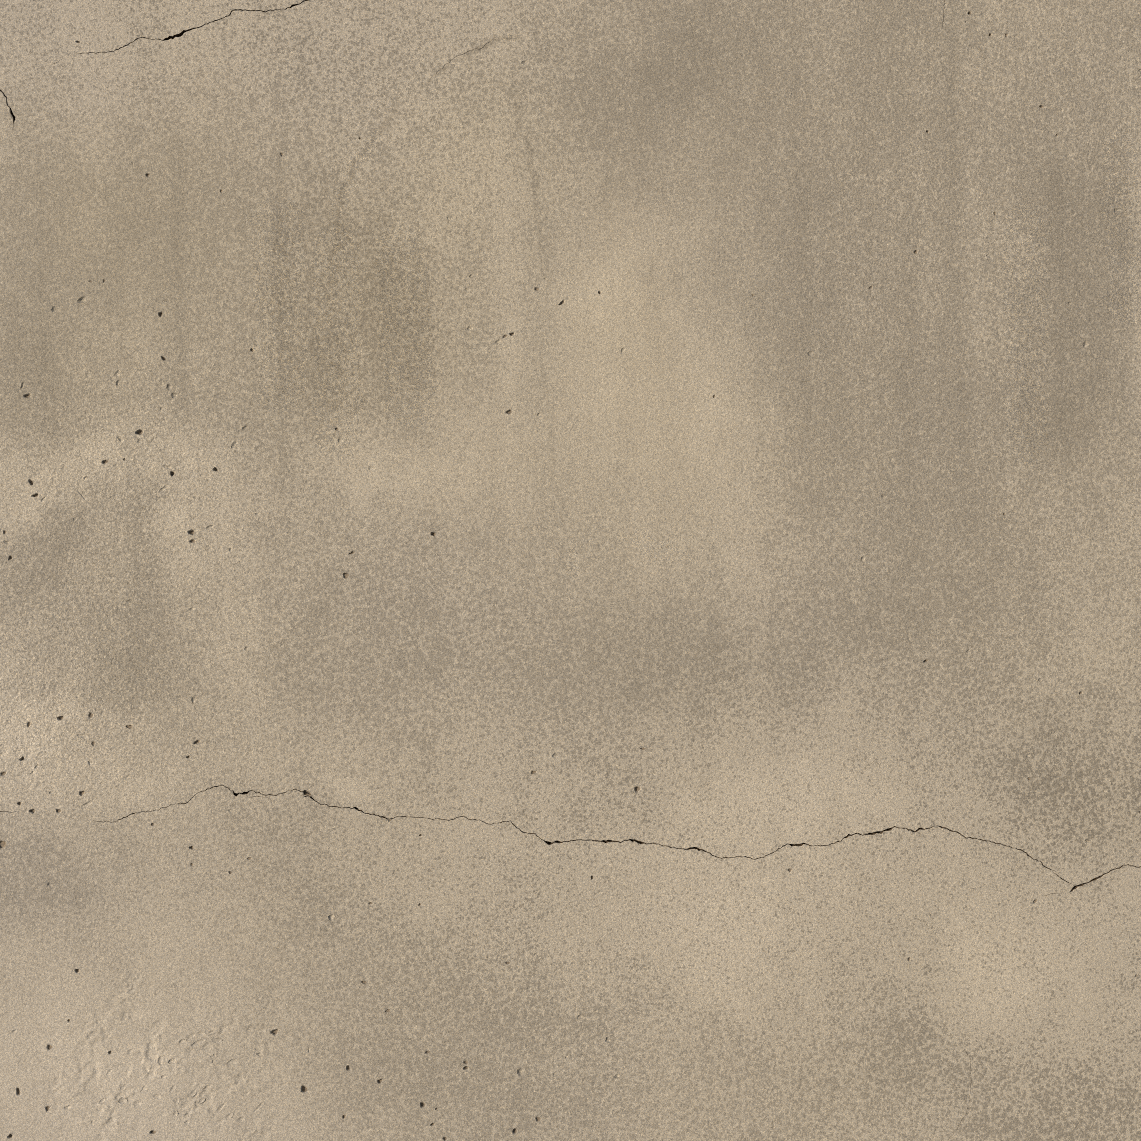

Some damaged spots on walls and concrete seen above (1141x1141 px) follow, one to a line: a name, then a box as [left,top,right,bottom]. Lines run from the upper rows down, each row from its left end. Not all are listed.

crack [51,0,311,65]
crack [0,90,15,139]
crack [48,785,1141,897]